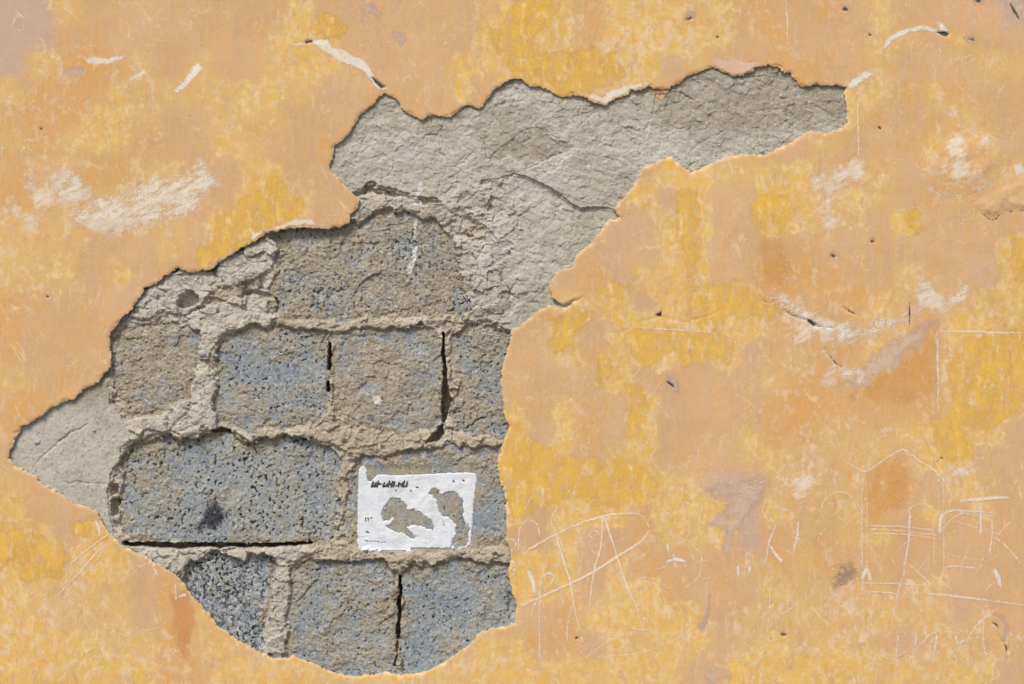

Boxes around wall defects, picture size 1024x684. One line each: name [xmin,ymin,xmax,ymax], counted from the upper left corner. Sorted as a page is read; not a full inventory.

peeling [64,53,126,79]
peeling [807,163,863,234]
spalling [3,58,848,677]